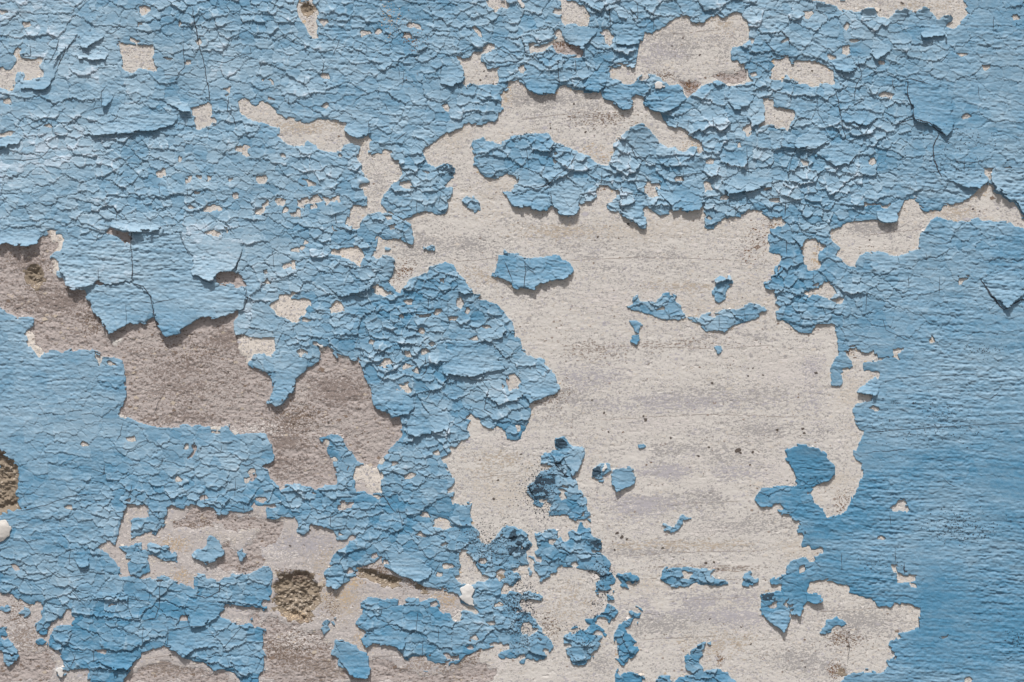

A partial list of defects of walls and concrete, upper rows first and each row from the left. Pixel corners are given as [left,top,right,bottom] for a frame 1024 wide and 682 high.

crack [166,8,251,125]
crack [789,62,862,173]
crack [892,78,974,177]
peeling [185,175,222,213]
crack [116,210,174,322]
flaking render [0,216,450,500]
peeling [223,0,920,682]
crack [980,279,1024,310]
flaking render [173,506,283,575]
flaking render [0,627,64,682]
peeling [96,596,233,682]
crack [136,584,220,645]